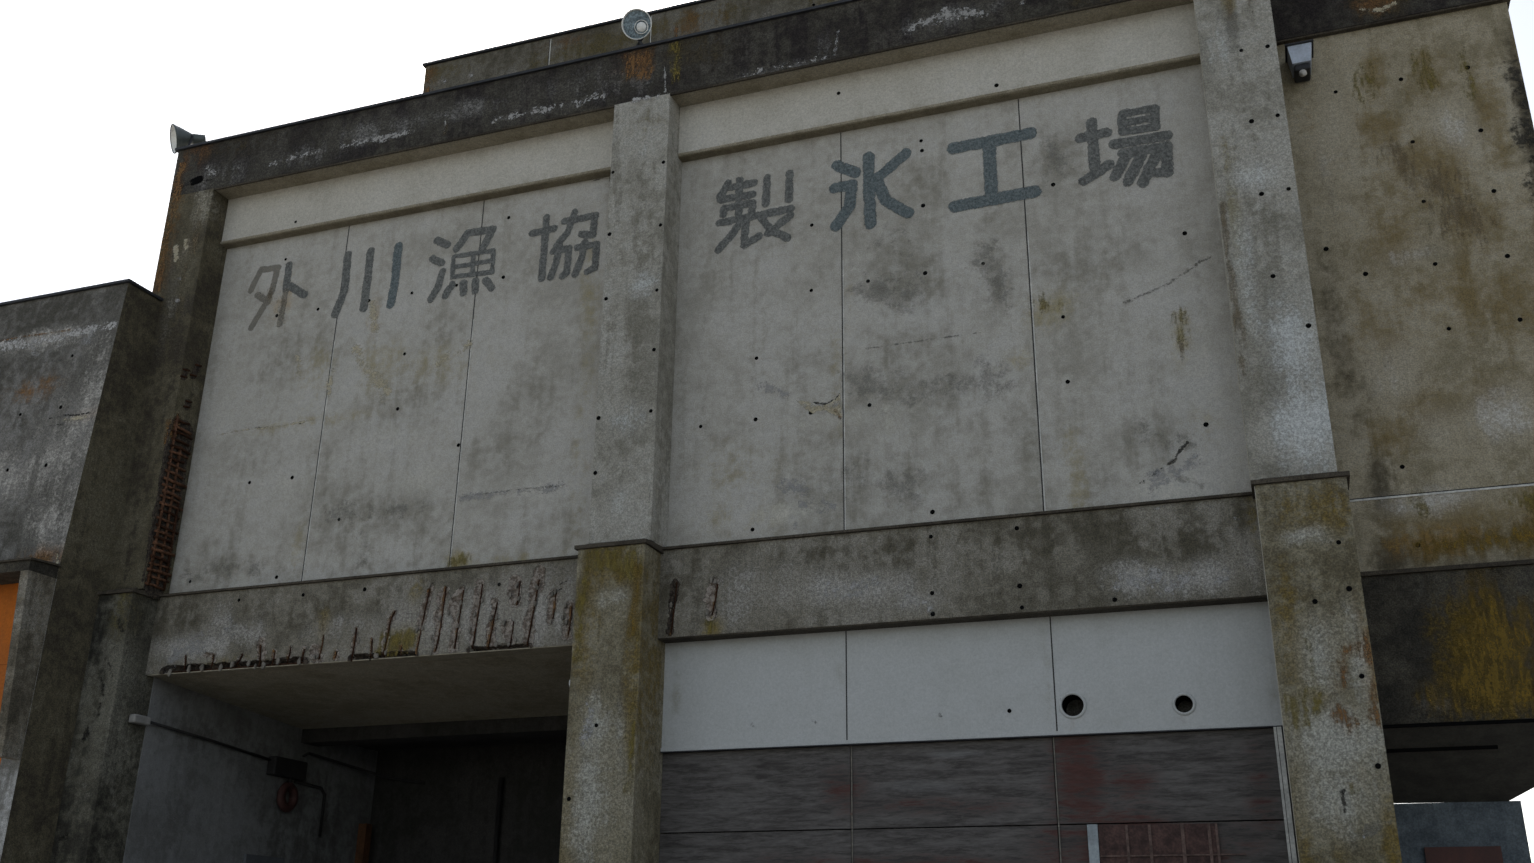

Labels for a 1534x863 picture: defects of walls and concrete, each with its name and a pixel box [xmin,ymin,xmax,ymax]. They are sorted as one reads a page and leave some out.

crack [1123,257,1211,303]
corrosion [142,414,193,599]
crack [1140,441,1189,510]
spalling [159,564,575,677]
spalling [665,578,680,636]